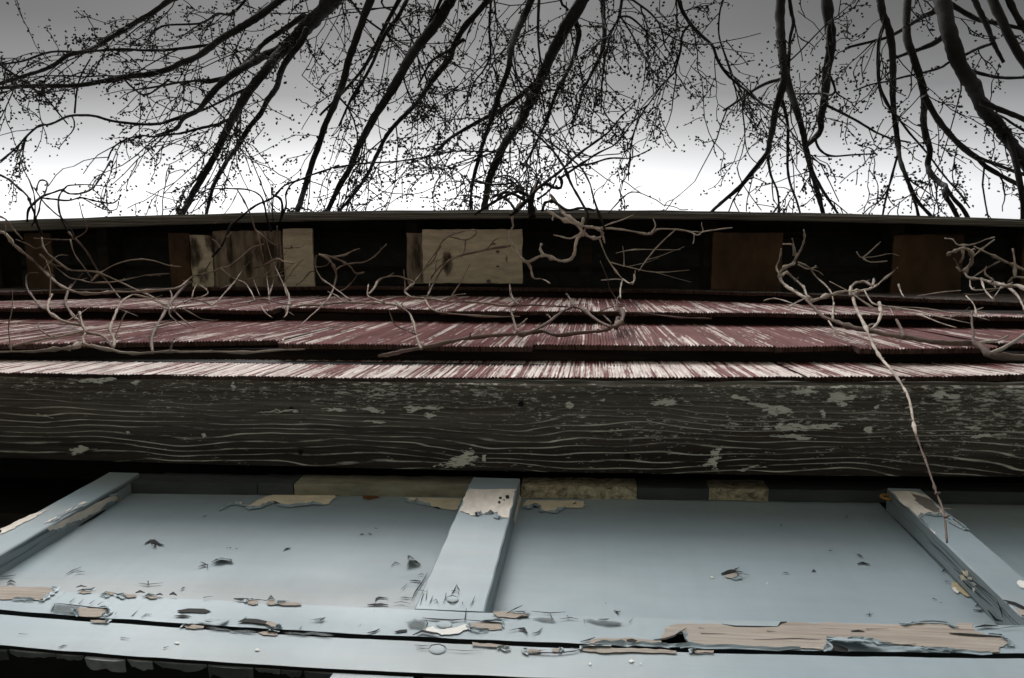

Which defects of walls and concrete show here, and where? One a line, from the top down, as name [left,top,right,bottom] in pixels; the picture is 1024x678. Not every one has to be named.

peeling [792,388,857,407]
peeling [931,391,962,399]
peeling [363,407,387,424]
peeling [762,405,843,440]
peeling [964,426,1010,439]
peeling [69,445,97,455]
peeling [0,493,120,534]
peeling [219,495,336,511]
peeling [405,489,585,523]
peeling [891,491,969,535]
peeling [0,585,177,624]
peeling [394,605,1024,665]